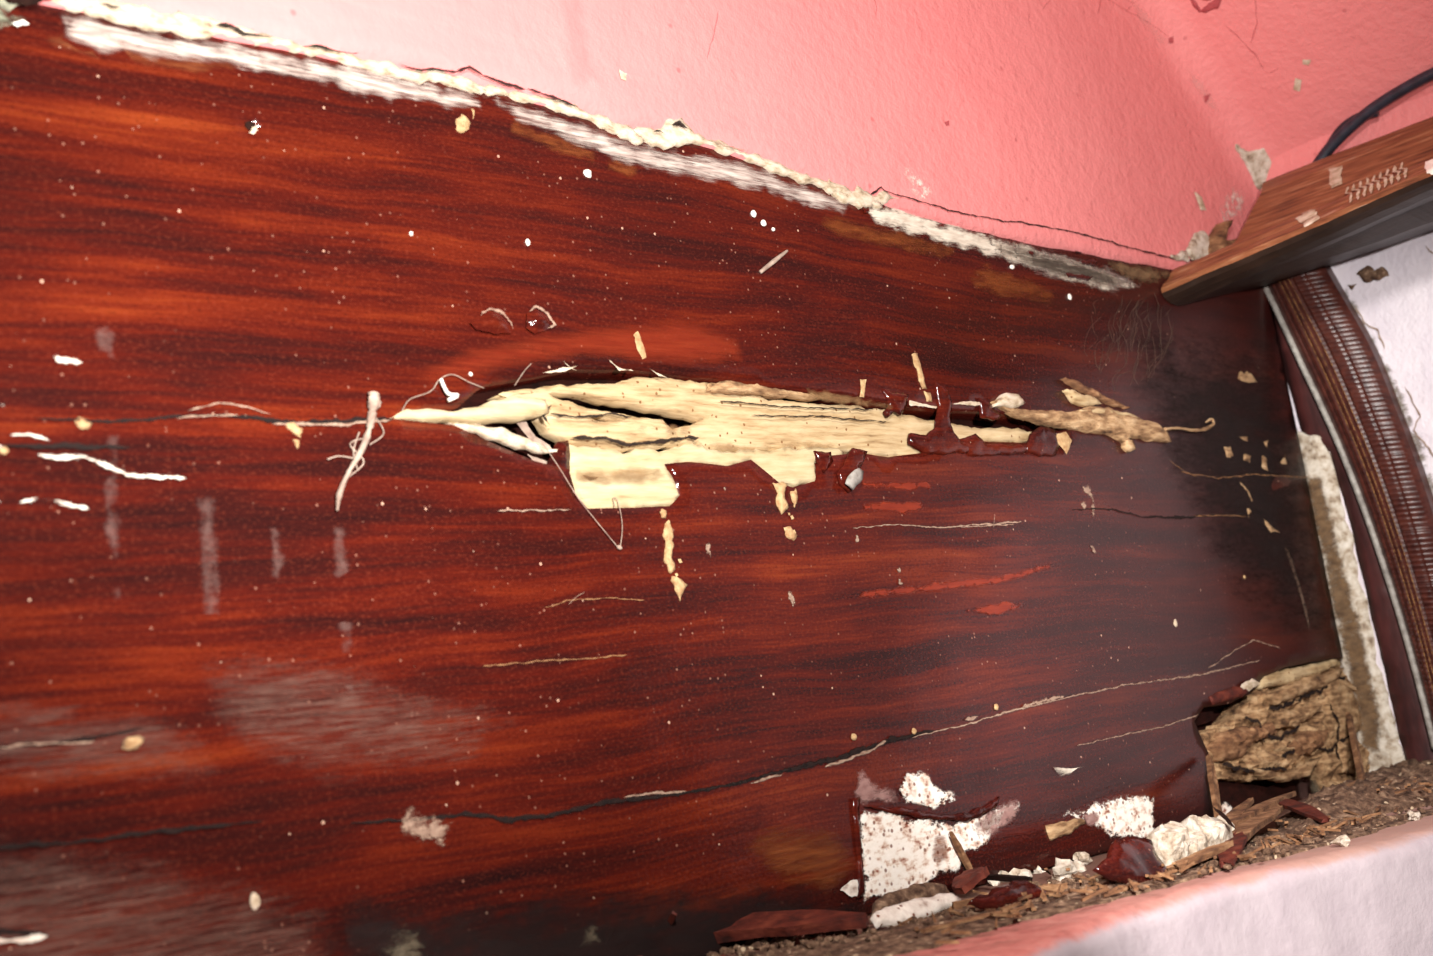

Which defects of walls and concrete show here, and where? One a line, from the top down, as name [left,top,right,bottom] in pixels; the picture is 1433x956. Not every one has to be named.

peeling [1191,0,1222,13]
peeling [7,0,898,213]
peeling [1065,251,1098,281]
spalling [706,380,822,402]
crack [352,639,1279,824]
peeling [1206,659,1370,783]
peeling [841,773,1018,899]
peeling [1045,796,1168,884]
peeling [967,880,1054,911]